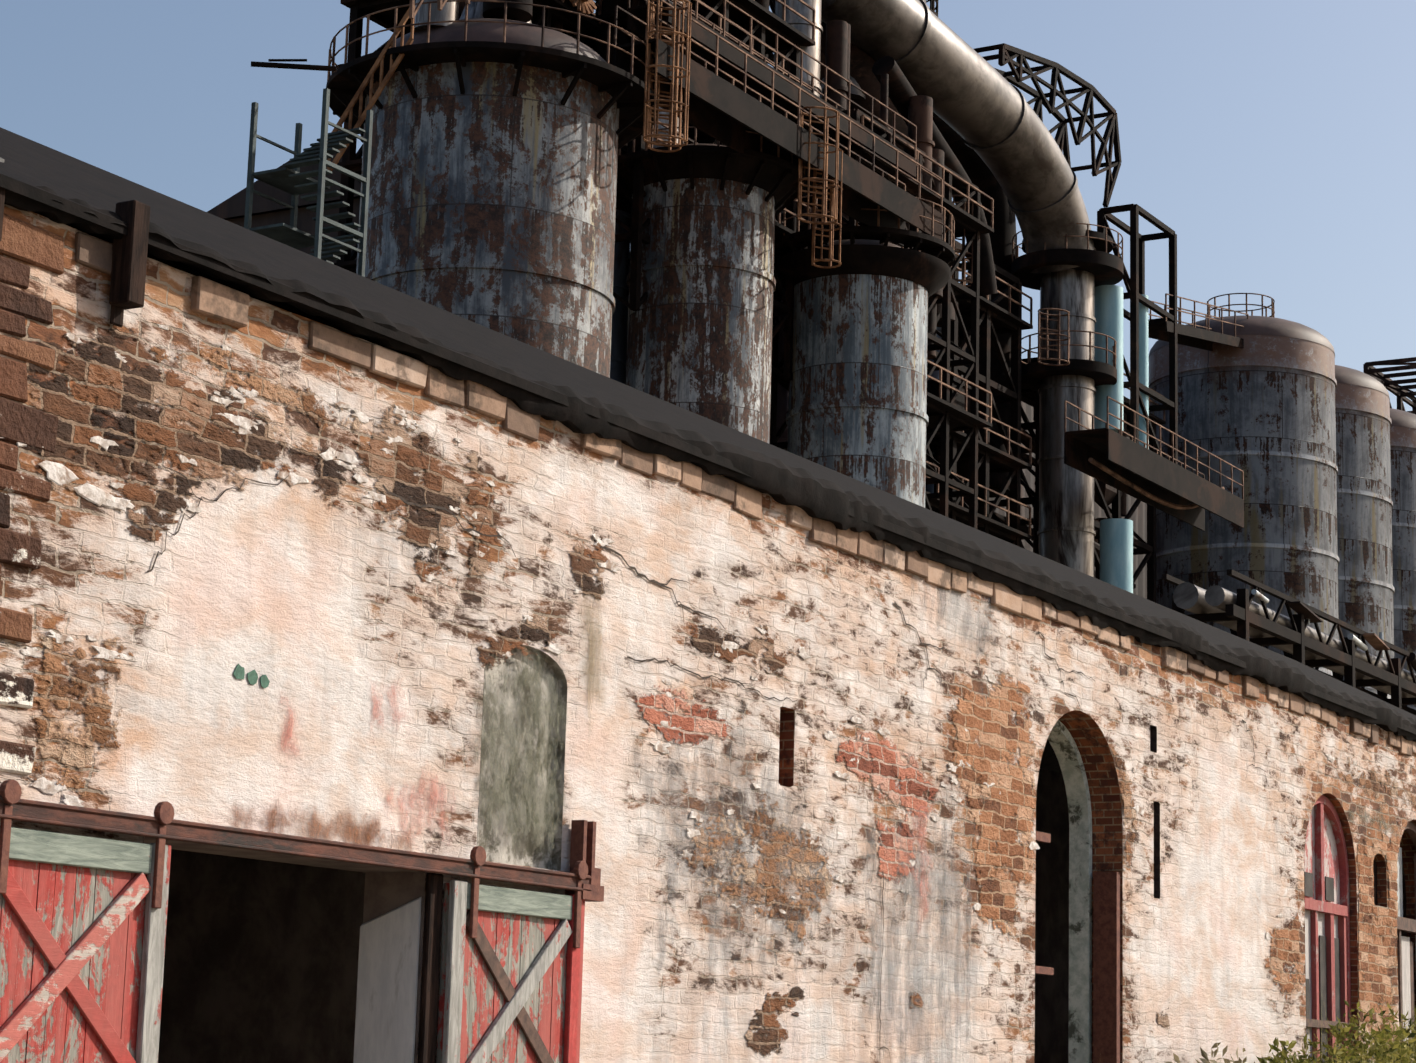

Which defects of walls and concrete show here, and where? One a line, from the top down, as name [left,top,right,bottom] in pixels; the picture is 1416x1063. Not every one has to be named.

spalling [0,301,506,584]
crack [147,465,289,572]
spalling [567,534,621,600]
crack [601,546,725,629]
spalling [21,624,137,807]
damp [477,658,564,848]
spalling [477,614,565,670]
peeling [635,679,729,754]
crack [627,656,797,702]
peeling [824,670,1040,941]
spalling [677,783,844,955]
peeling [1265,913,1304,1000]